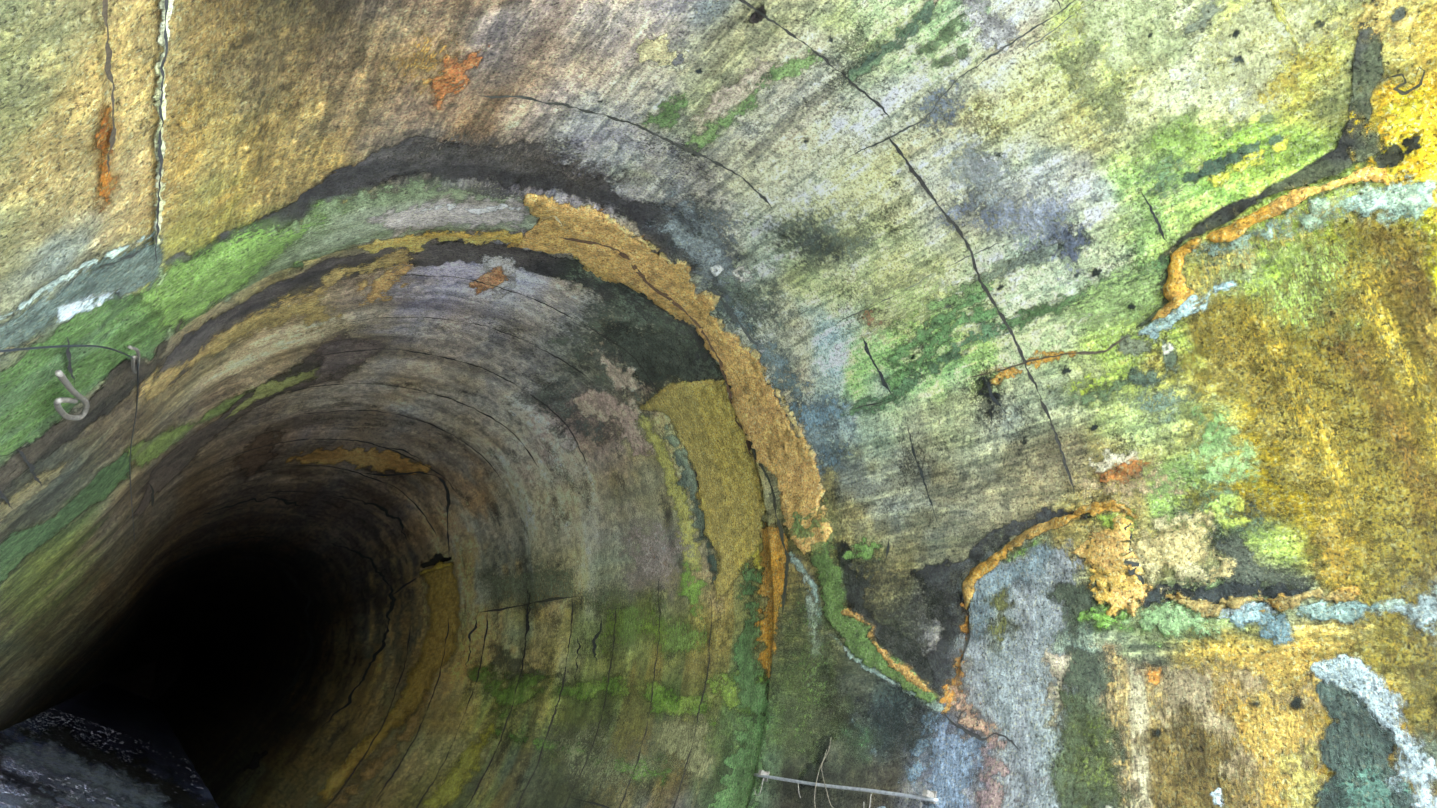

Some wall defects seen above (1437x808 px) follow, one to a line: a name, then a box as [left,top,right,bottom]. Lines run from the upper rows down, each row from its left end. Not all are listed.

crack [93,0,121,213]
crack [153,0,174,287]
water stain [135,0,384,148]
crack [478,95,774,212]
crack [703,288,763,352]
crack [739,0,1096,521]
crack [1141,192,1168,243]
water stain [1136,0,1437,402]
crack [1272,0,1305,59]
water stain [1253,346,1387,497]
spalling [1123,509,1361,618]
water stain [1172,468,1437,808]